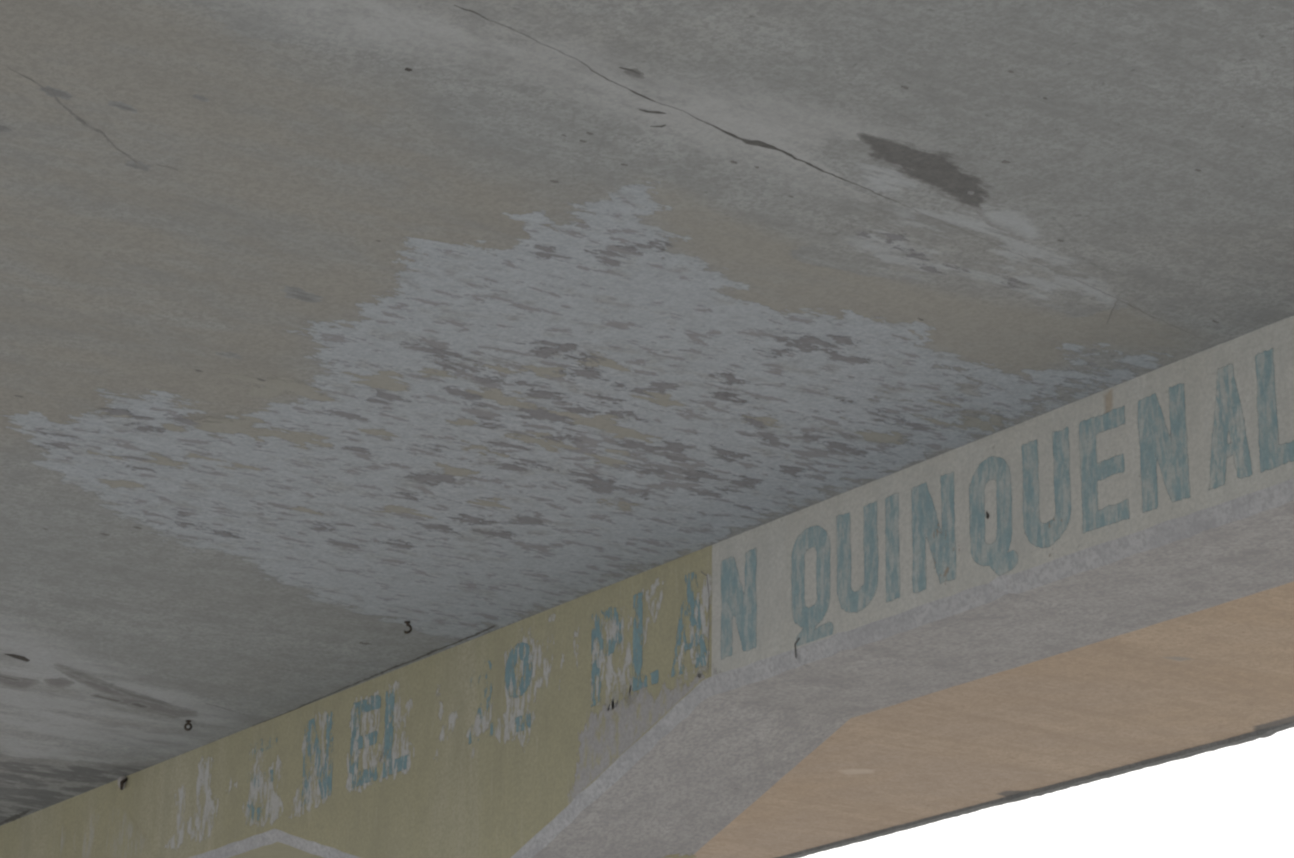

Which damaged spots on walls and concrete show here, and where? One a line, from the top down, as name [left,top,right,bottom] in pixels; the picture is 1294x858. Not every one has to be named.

water stain [0,0,1230,463]
crack [454,5,1203,339]
peeling [0,181,1173,804]